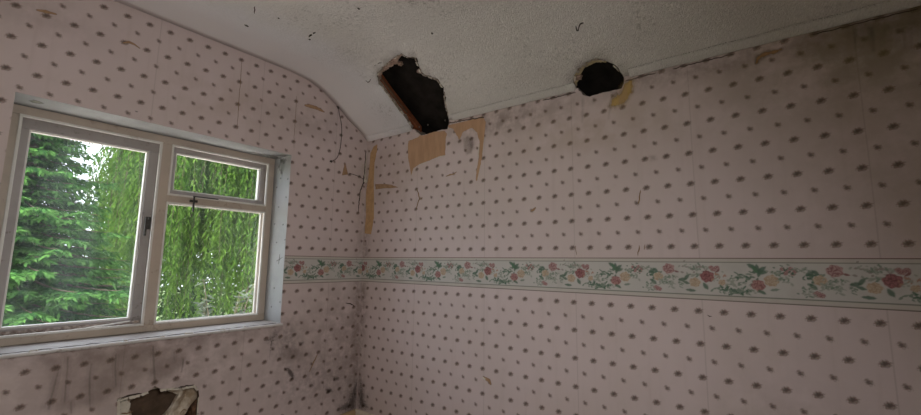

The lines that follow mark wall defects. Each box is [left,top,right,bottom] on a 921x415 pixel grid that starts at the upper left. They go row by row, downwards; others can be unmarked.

spalling [574,59,620,86]
spalling [377,53,449,128]
spalling [117,385,199,415]